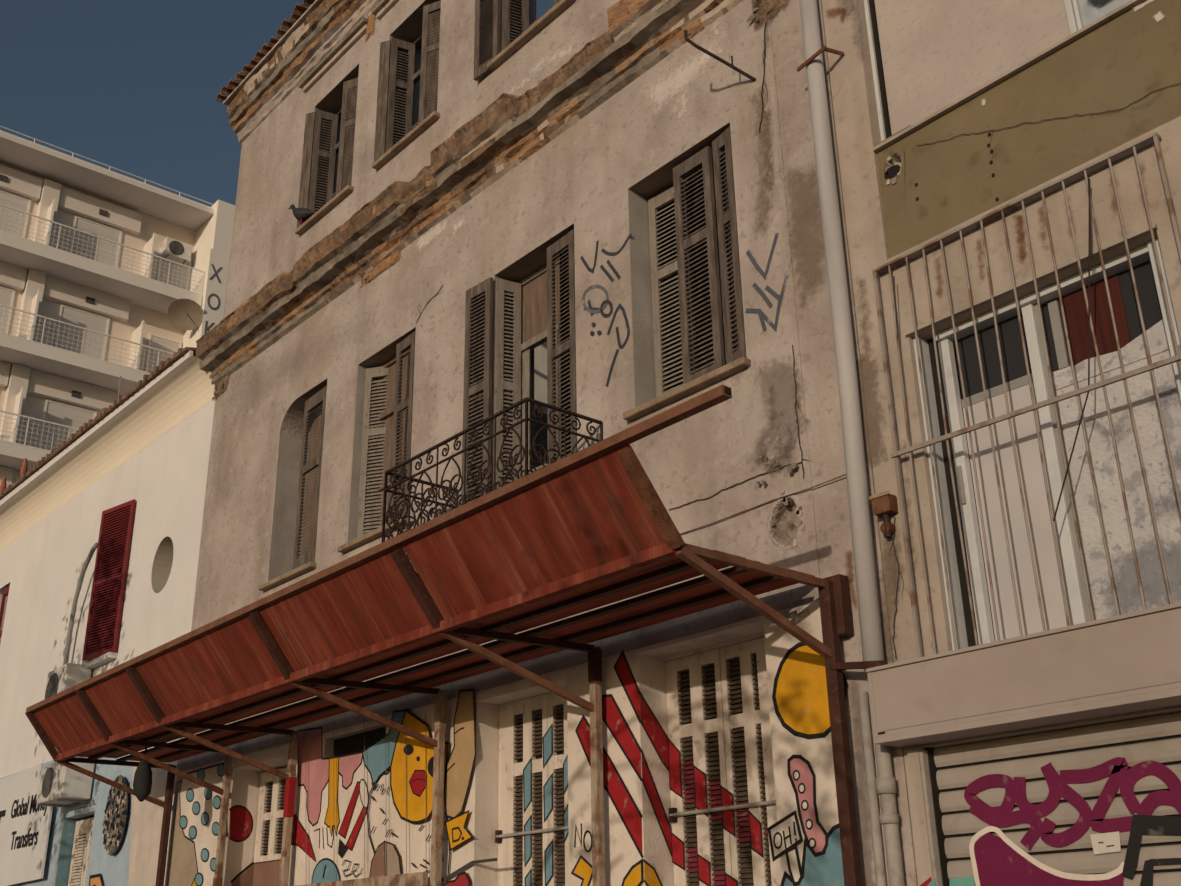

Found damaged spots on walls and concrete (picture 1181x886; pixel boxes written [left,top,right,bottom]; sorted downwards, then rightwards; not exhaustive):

spalling [746,0,788,29]
crack [904,83,1181,204]
peeling [416,215,466,251]
corrosion [1017,216,1025,259]
spalling [359,249,400,288]
crack [669,345,810,510]
spalling [764,483,809,559]